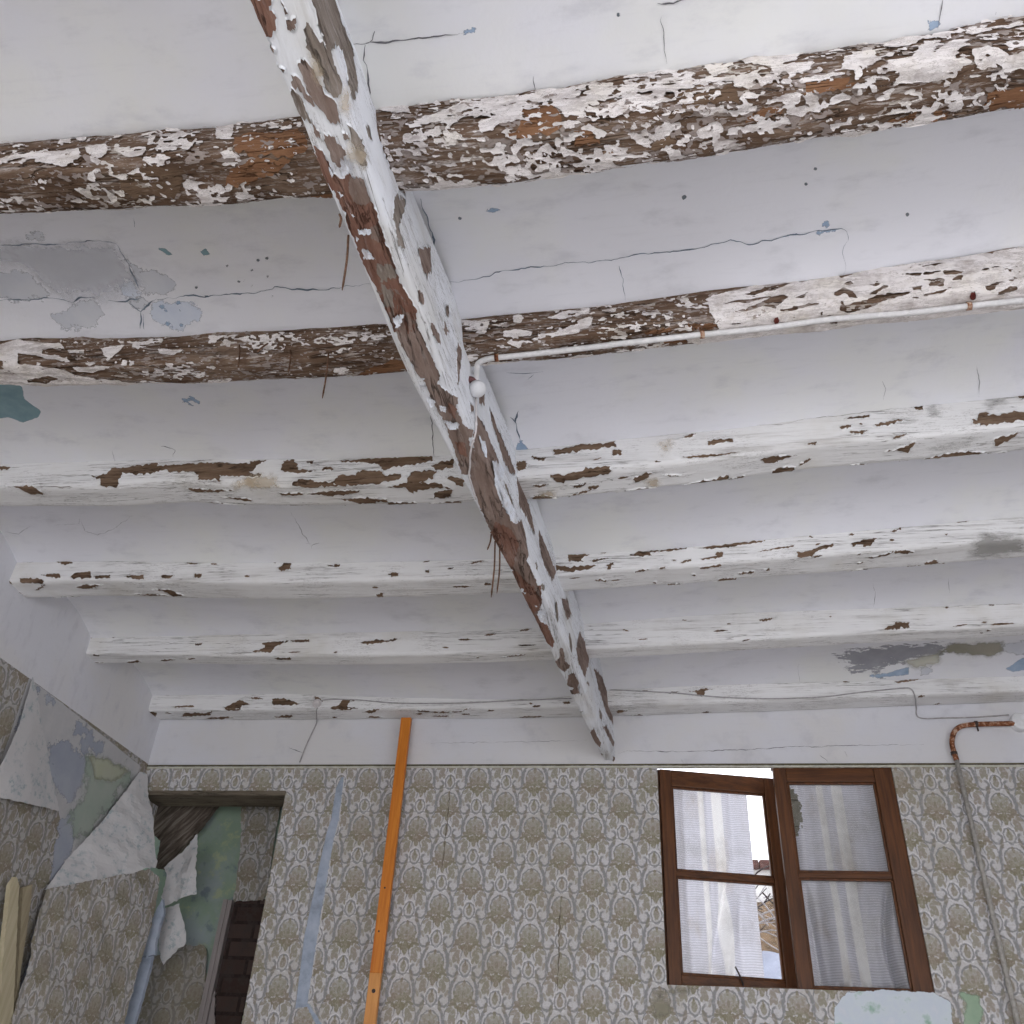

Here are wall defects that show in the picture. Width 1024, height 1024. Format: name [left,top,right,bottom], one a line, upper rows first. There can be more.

crack [0,218,363,328]
crack [461,228,849,294]
peeling [0,0,1024,761]